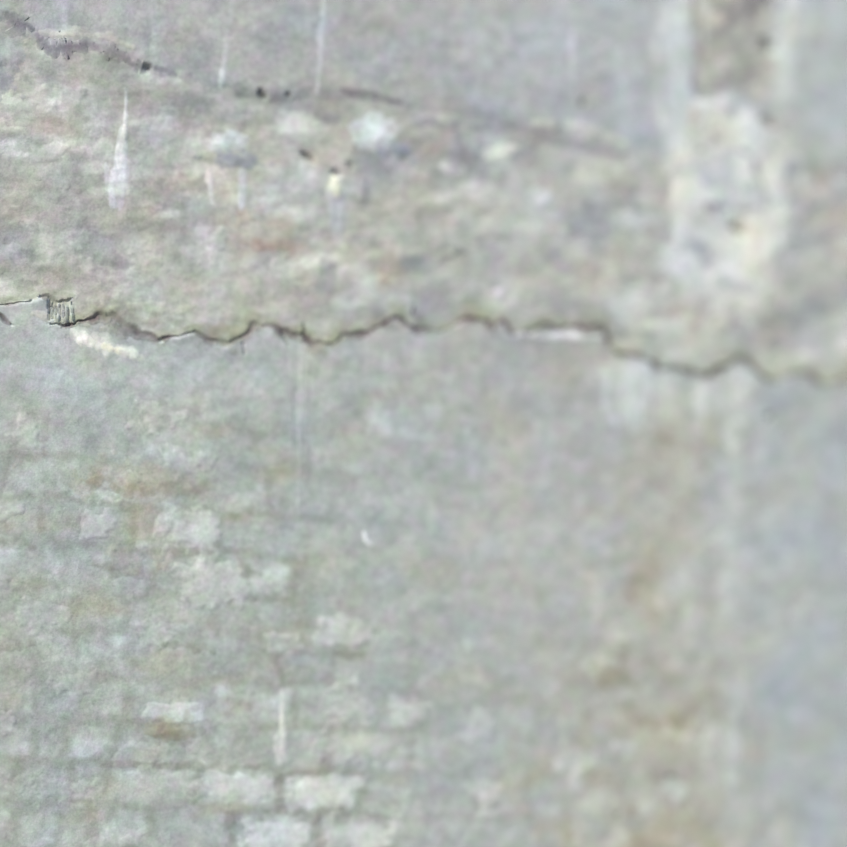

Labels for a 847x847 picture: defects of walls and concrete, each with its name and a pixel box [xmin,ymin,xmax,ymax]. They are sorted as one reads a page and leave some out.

crack [0,278,847,390]